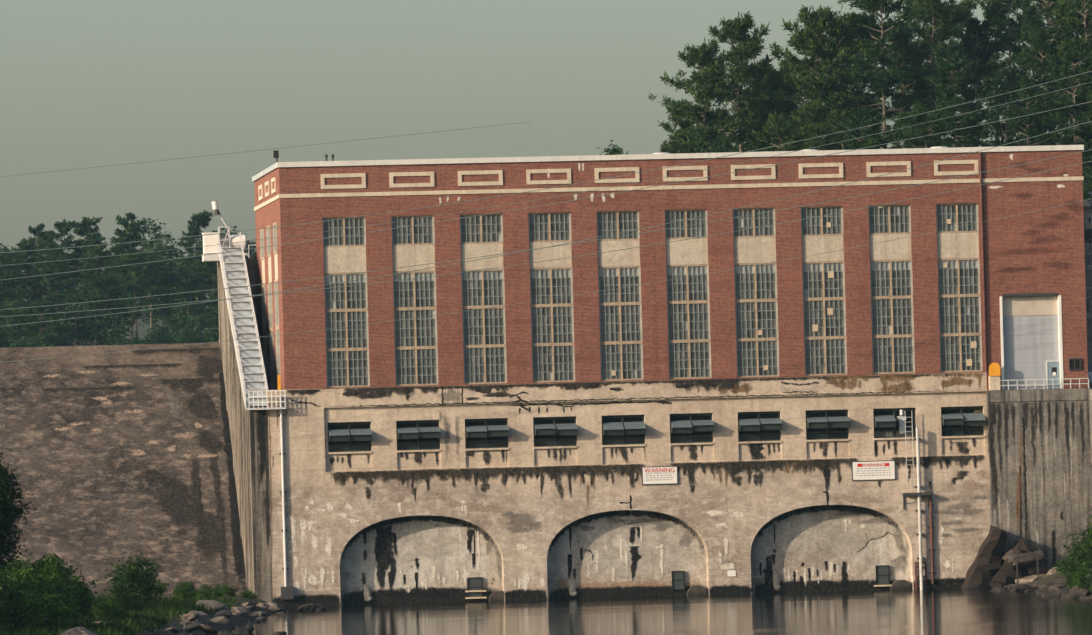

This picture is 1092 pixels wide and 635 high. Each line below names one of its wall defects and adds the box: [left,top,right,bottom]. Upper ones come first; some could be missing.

leakage [85,335,320,589]
leakage [272,500,703,607]
leakage [330,374,948,500]
leakage [671,442,908,596]
spalling [781,382,819,393]
leakage [910,556,965,590]
leakage [874,402,1085,545]